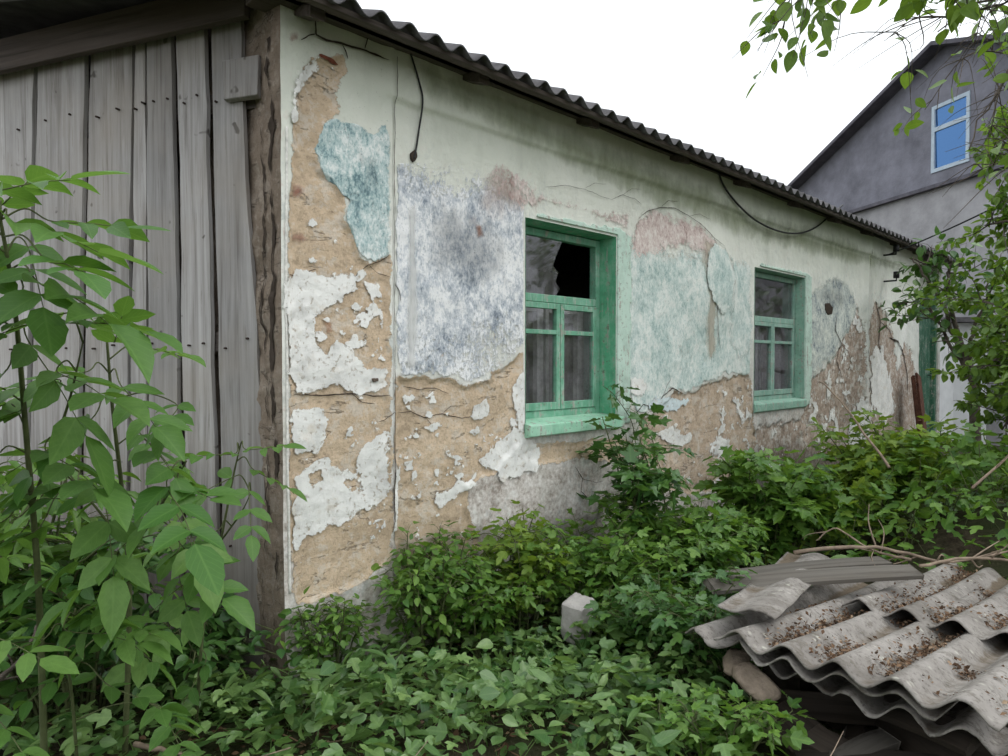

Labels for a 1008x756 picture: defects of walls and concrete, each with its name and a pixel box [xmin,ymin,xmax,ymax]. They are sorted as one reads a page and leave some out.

flaking render [287,53,917,605]